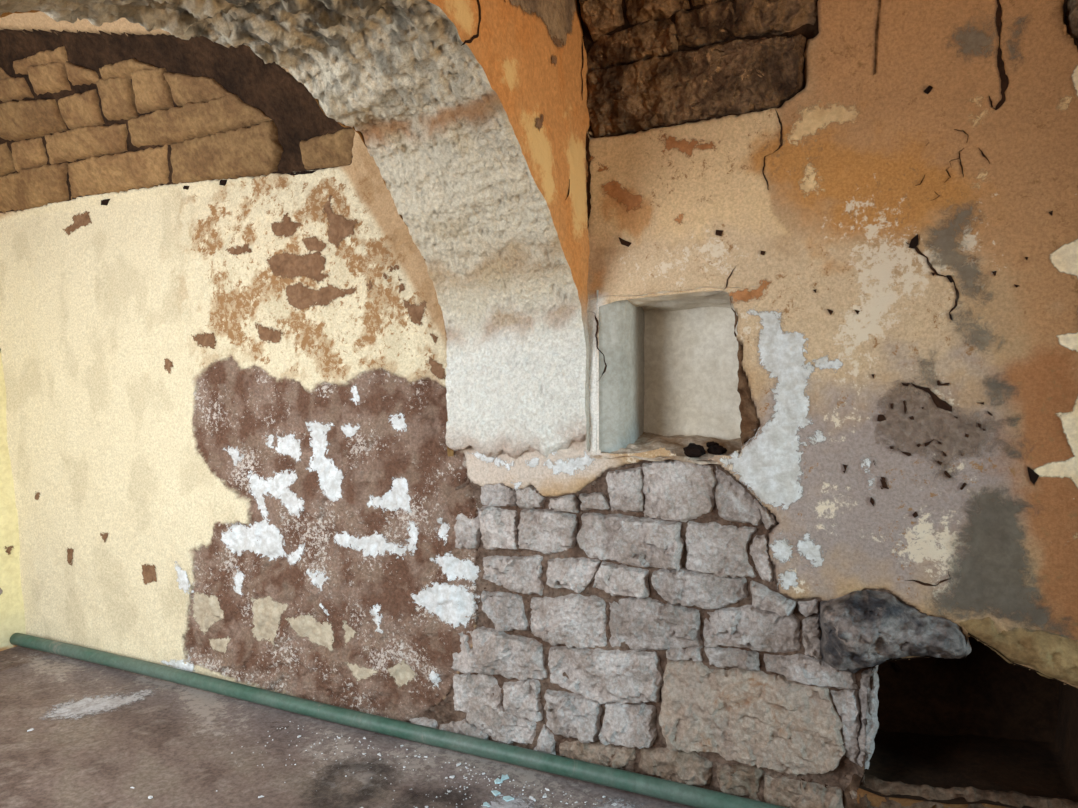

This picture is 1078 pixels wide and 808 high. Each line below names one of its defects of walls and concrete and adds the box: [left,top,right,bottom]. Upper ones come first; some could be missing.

crack [461,0,505,46]
crack [578,36,586,100]
spalling [510,0,819,156]
crack [989,0,1009,110]
peeling [64,211,92,235]
peeling [266,195,372,311]
crack [906,242,959,313]
peeling [1050,239,1078,278]
spalling [877,380,998,478]
peeling [1034,397,1078,487]
peeling [142,563,157,585]
spalling [161,280,879,808]